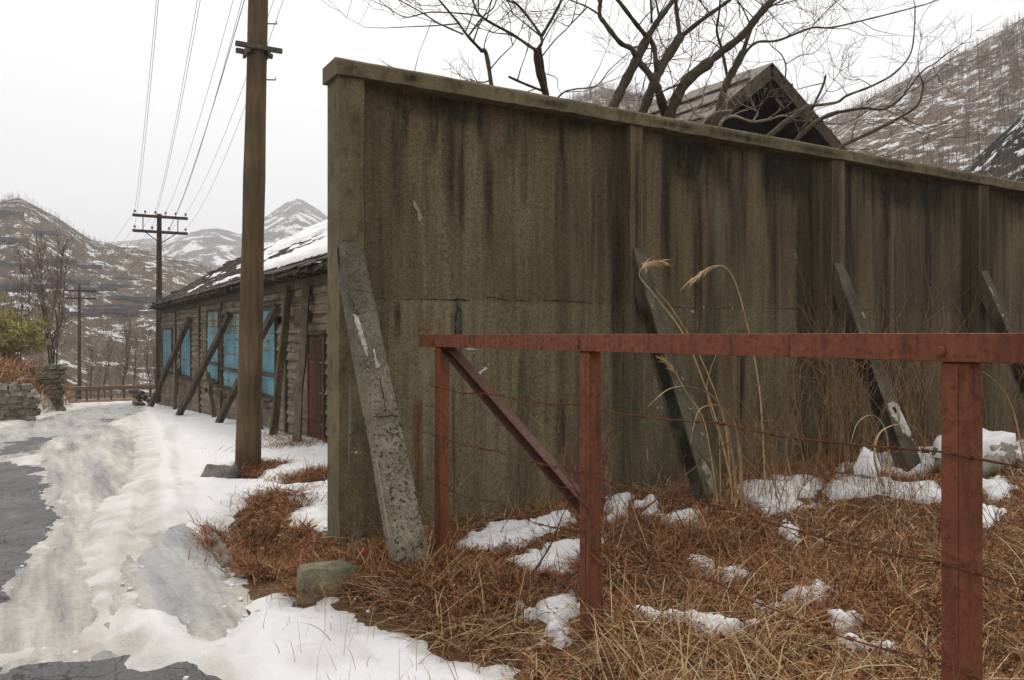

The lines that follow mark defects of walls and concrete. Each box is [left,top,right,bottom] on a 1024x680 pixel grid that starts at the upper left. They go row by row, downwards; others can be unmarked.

crack [349,290,603,334]
water stain [650,353,695,469]
water stain [856,359,895,435]
water stain [1009,364,1024,399]